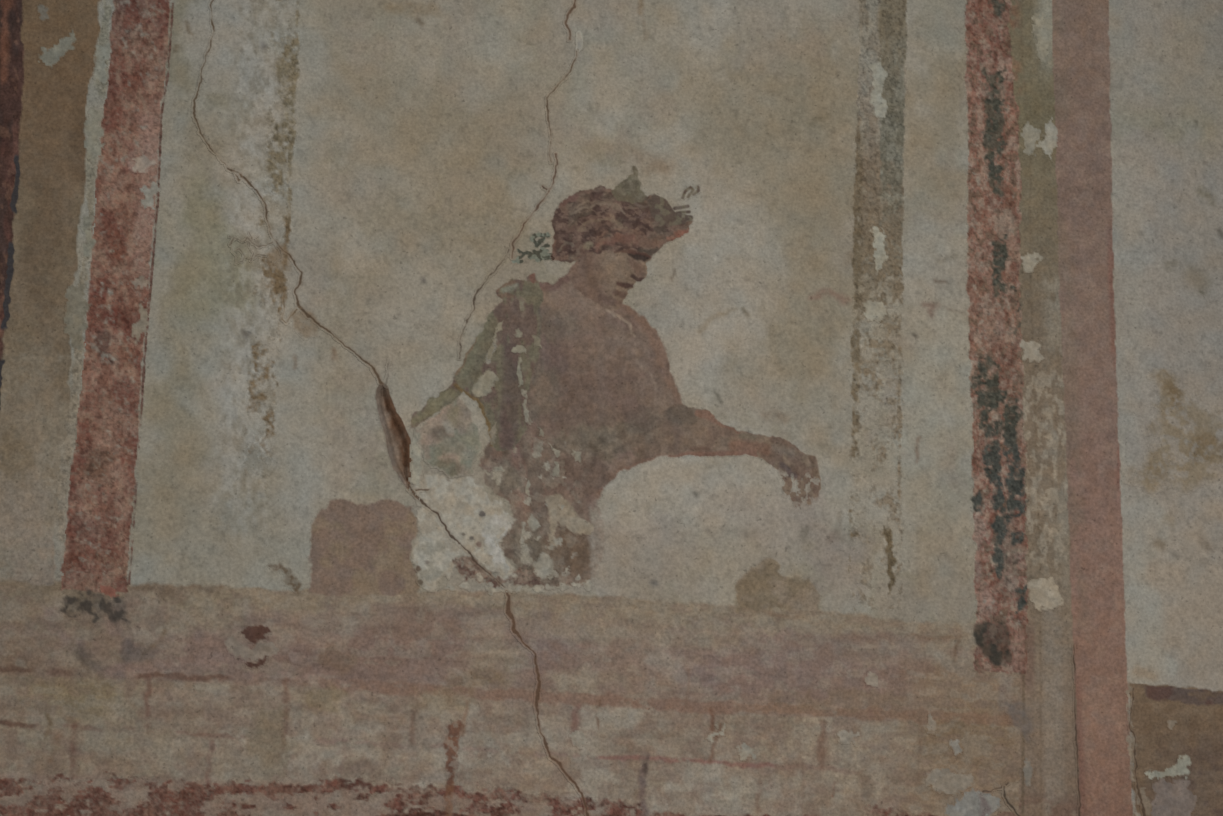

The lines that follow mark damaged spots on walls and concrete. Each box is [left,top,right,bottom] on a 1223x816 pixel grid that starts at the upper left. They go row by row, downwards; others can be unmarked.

flaking render [37,25,77,69]
flaking render [93,34,111,87]
flaking render [867,55,889,118]
flaking render [1020,116,1059,162]
crack [191,0,392,389]
crack [457,0,583,361]
flaking render [868,226,889,273]
flaking render [1019,339,1045,363]
flaking render [471,320,582,477]
flaking render [375,385,596,596]
flaking render [1026,576,1064,612]
crack [406,481,592,816]